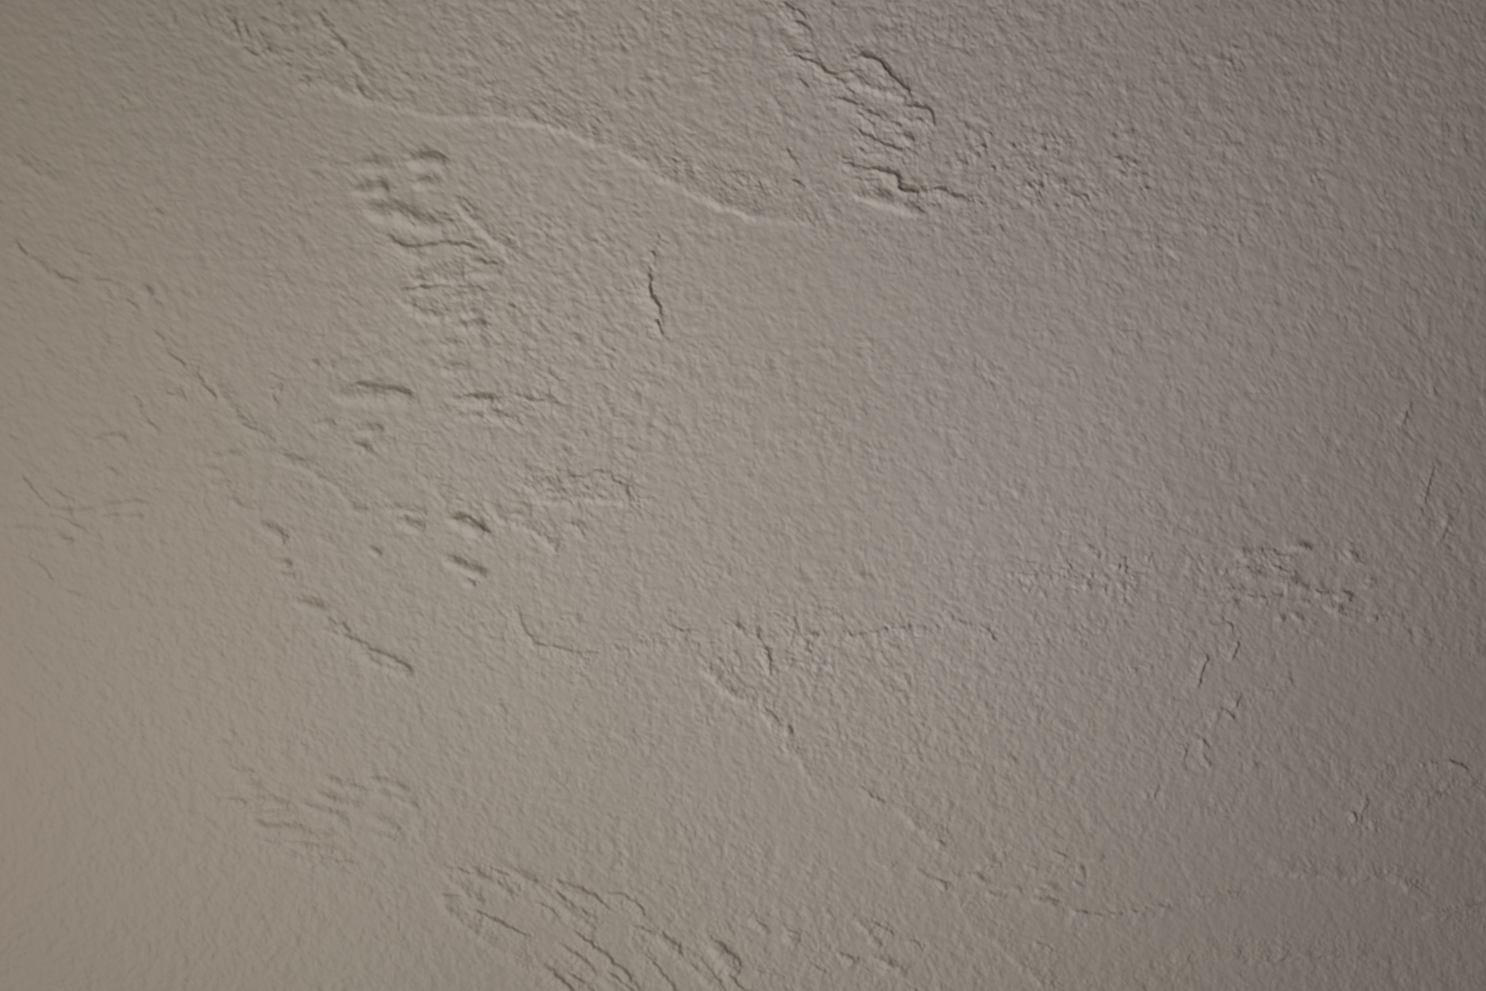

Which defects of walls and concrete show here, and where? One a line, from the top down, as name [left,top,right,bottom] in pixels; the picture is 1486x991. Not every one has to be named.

crack [756,0,821,50]